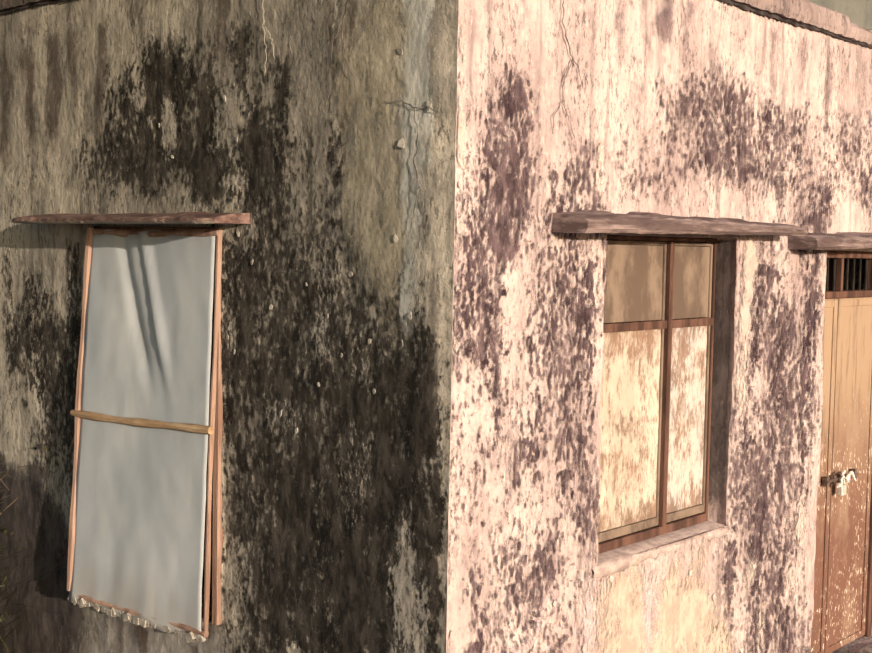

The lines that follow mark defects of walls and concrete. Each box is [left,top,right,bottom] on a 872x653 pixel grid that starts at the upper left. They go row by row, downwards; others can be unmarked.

crack [552,0,583,138]
water stain [658,0,672,37]
crack [721,0,872,49]
crack [388,99,444,237]
water stain [612,60,872,233]
water stain [0,0,611,653]
water stain [708,235,825,653]